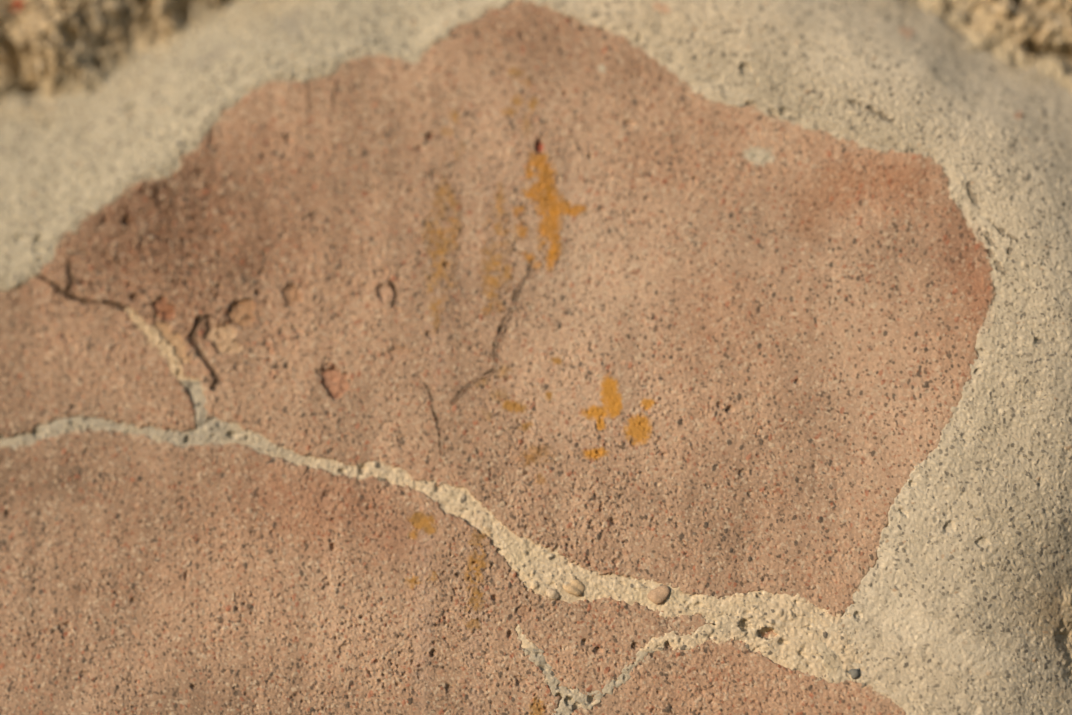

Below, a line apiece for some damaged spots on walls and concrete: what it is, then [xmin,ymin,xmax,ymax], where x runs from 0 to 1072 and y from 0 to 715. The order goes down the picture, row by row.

spalling [0,0,247,107]
spalling [907,0,1072,92]
crack [0,258,871,715]